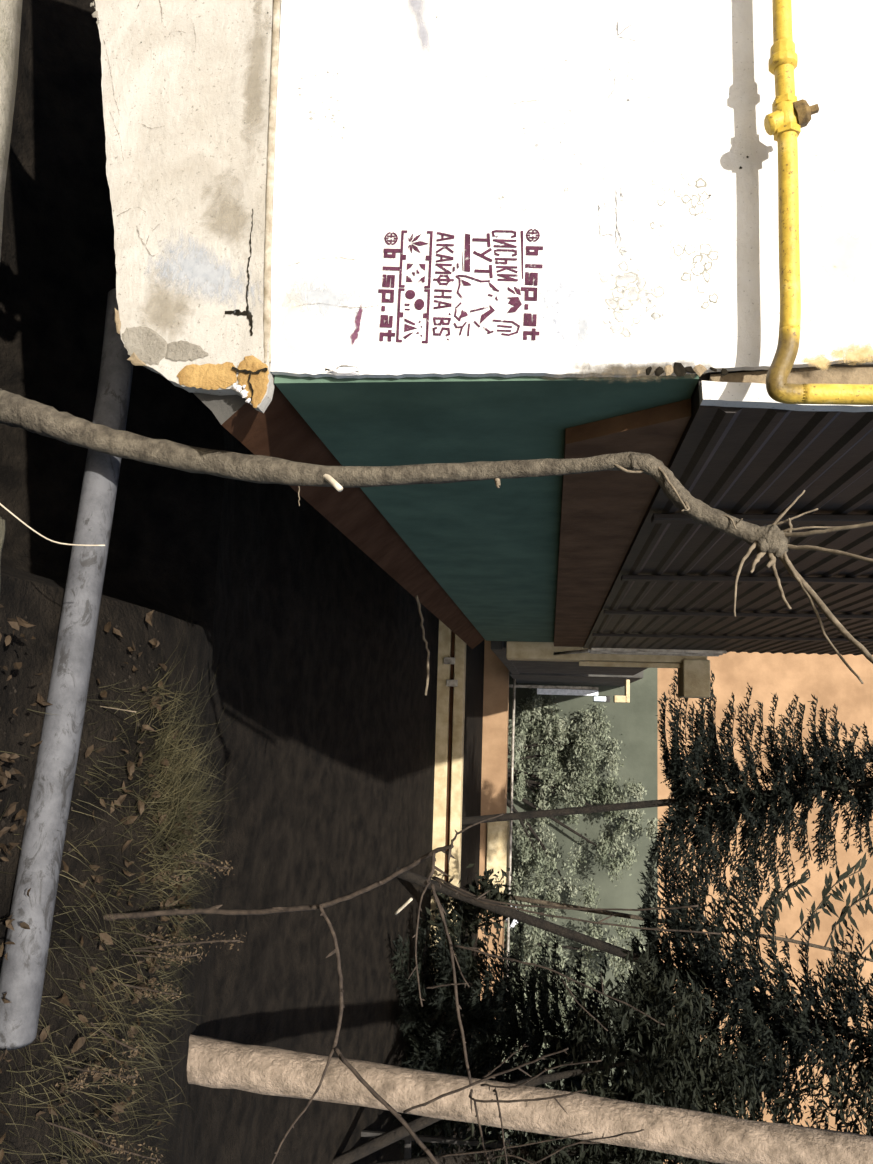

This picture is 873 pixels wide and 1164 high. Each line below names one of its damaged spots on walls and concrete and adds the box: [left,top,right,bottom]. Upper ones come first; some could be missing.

damp [409,0,428,46]
crack [225,209,253,336]
spalling [115,308,269,408]